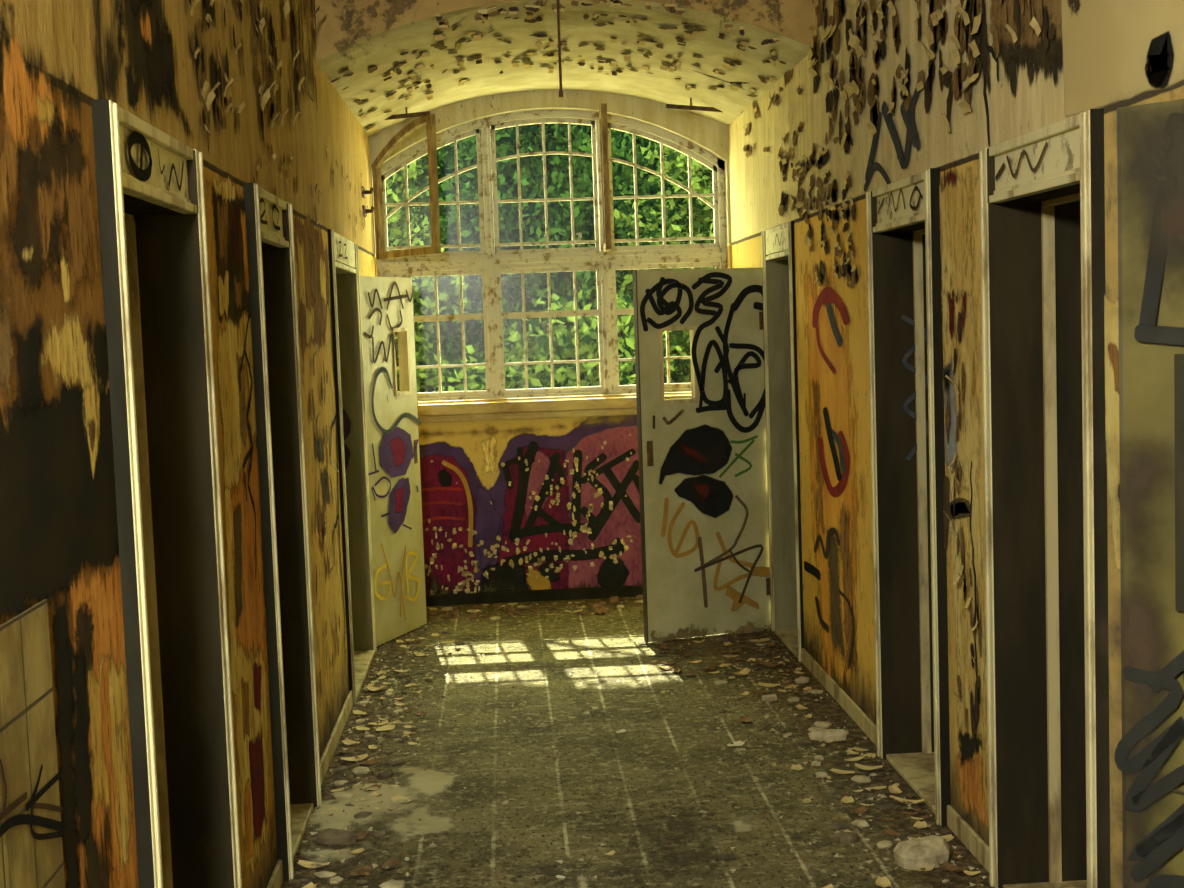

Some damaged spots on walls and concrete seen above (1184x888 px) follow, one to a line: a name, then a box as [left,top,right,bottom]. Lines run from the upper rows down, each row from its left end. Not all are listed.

peeling [0,34,109,479]